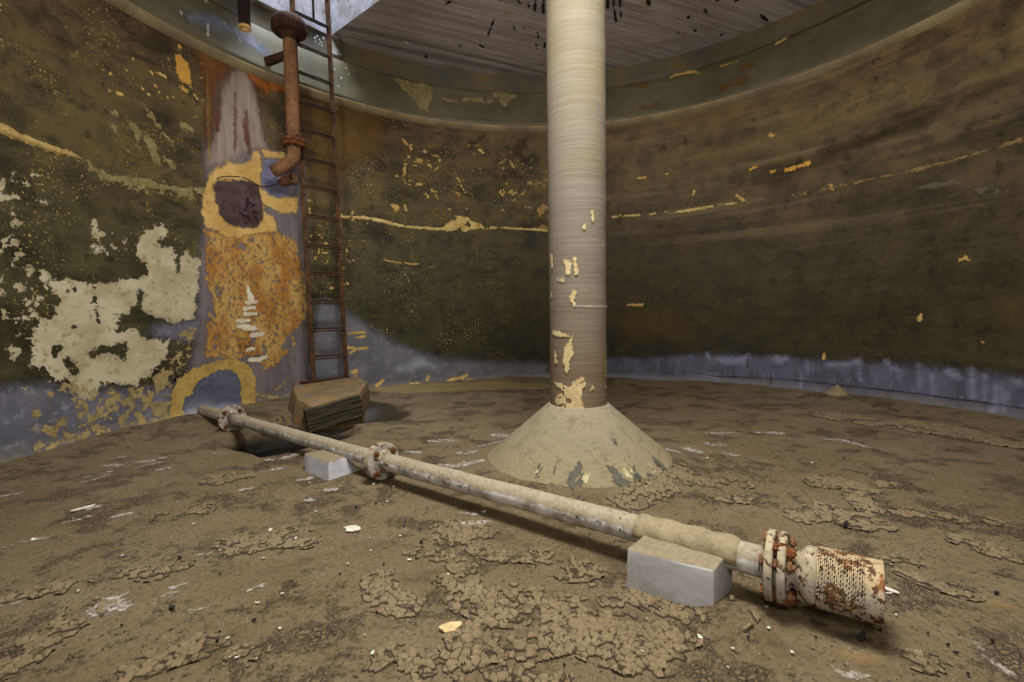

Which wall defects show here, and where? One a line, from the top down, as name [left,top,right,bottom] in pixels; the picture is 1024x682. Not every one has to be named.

damp [205,67,280,190]
flaking render [261,158,289,198]
peeling [395,141,439,199]
peeling [749,160,811,174]
rust [169,50,307,418]
damp [187,163,310,402]
peeling [550,254,579,306]
peeling [0,218,242,458]
flaking render [306,298,1024,420]
damp [704,353,749,382]
spalling [535,454,584,487]
spalling [605,456,667,486]